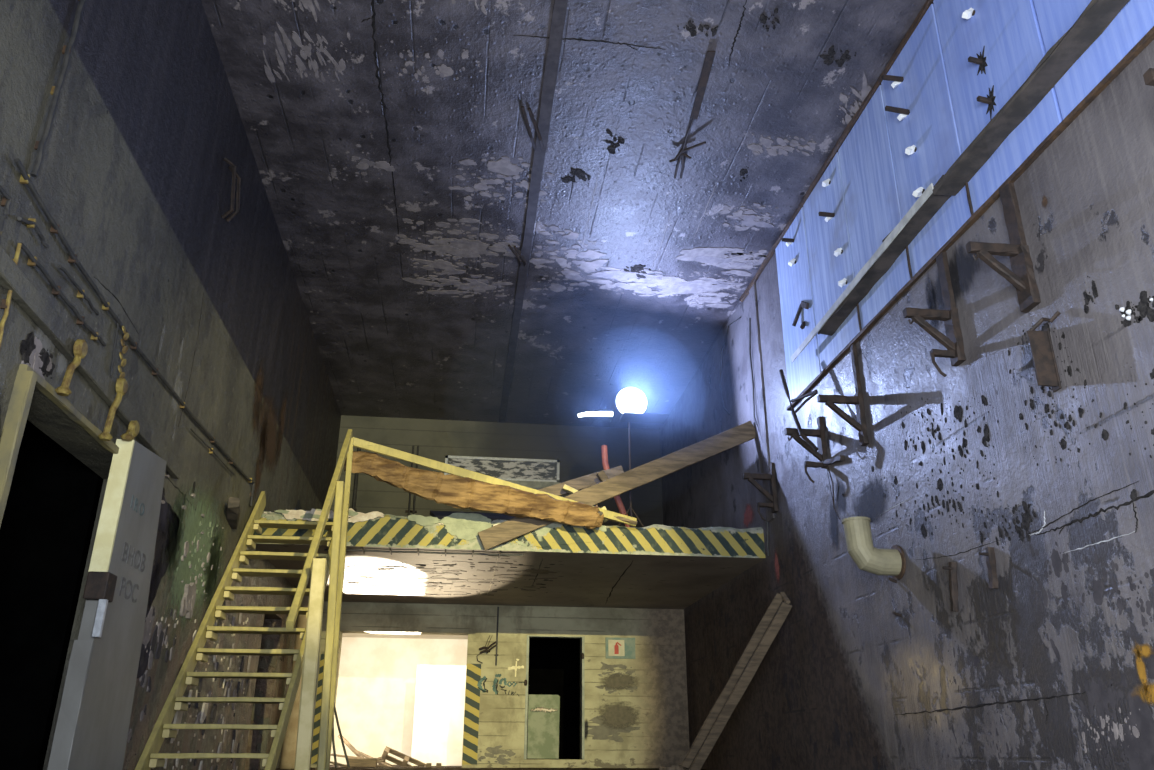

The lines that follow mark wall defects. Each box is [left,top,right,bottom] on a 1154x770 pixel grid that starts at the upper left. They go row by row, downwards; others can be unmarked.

peeling [397,156,767,308]
peeling [719,201,779,231]
spalling [1115,291,1154,327]
spalling [19,332,55,379]
corrosion [253,369,287,494]
crack [917,481,1154,560]
flaking render [127,470,252,770]
damp [599,674,639,729]
crack [895,691,1086,725]